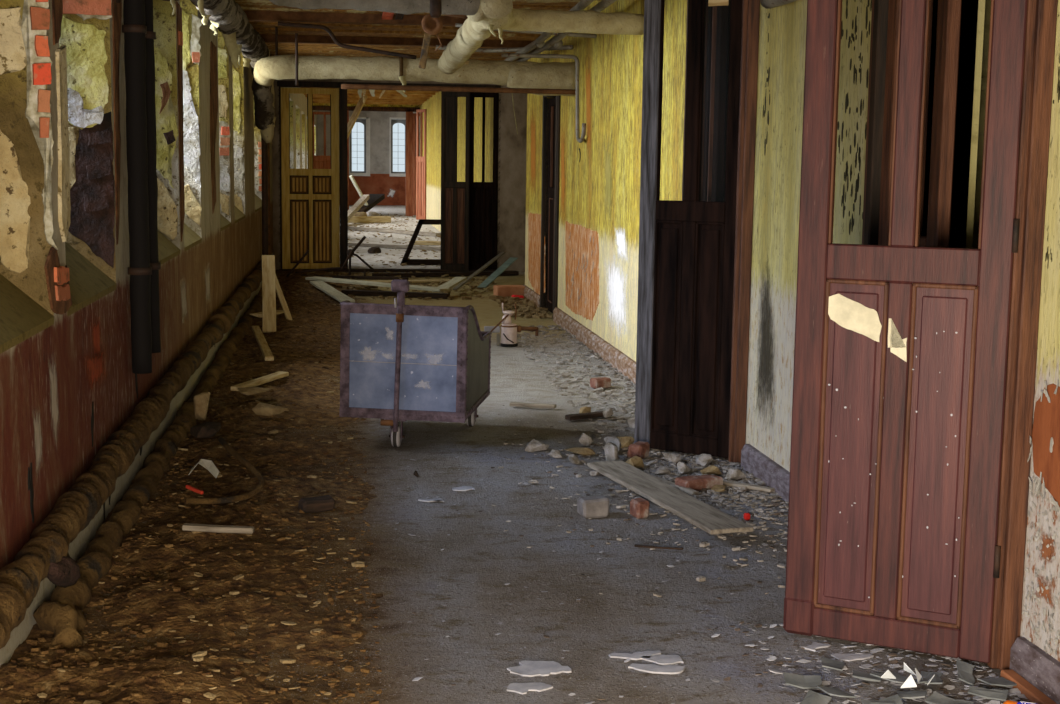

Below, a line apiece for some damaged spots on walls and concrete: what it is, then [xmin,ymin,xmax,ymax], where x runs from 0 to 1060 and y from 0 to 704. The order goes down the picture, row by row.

spalling [0,0,122,315]
peeling [1022,379,1060,655]
peeling [707,621,1030,704]